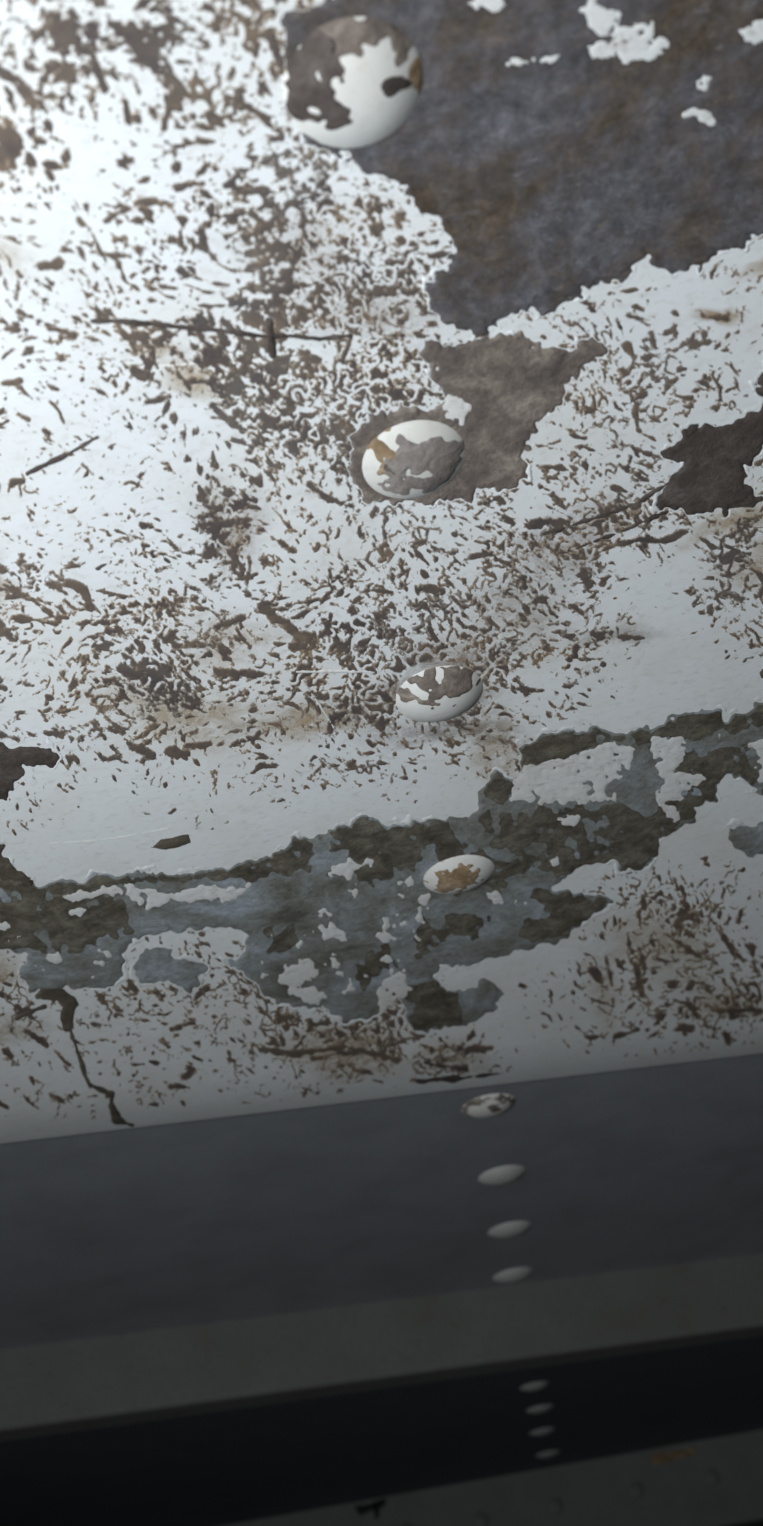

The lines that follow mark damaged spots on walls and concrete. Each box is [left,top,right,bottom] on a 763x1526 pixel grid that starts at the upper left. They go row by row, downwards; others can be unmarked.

crack [14,988,134,1127]
peeling [0,0,763,1119]